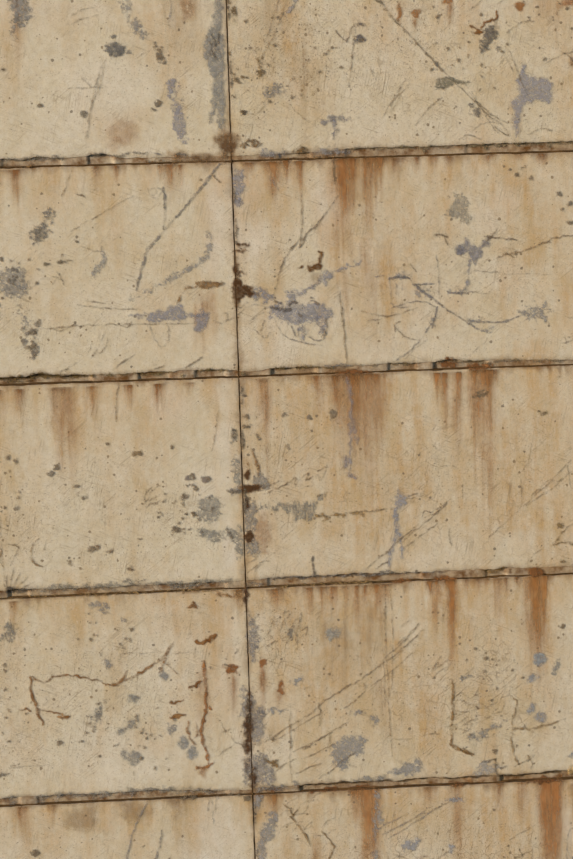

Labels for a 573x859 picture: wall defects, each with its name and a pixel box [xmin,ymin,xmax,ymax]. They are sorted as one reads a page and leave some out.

peeling [203,0,269,128]
peeling [512,65,552,128]
rust [266,160,303,192]
rust [335,157,396,213]
peeling [0,257,38,299]
peeling [252,263,359,340]
rust [300,251,323,272]
rust [331,369,379,411]
rust [434,357,497,423]
rust [426,567,547,640]
rust [349,784,379,855]
rust [518,775,562,859]